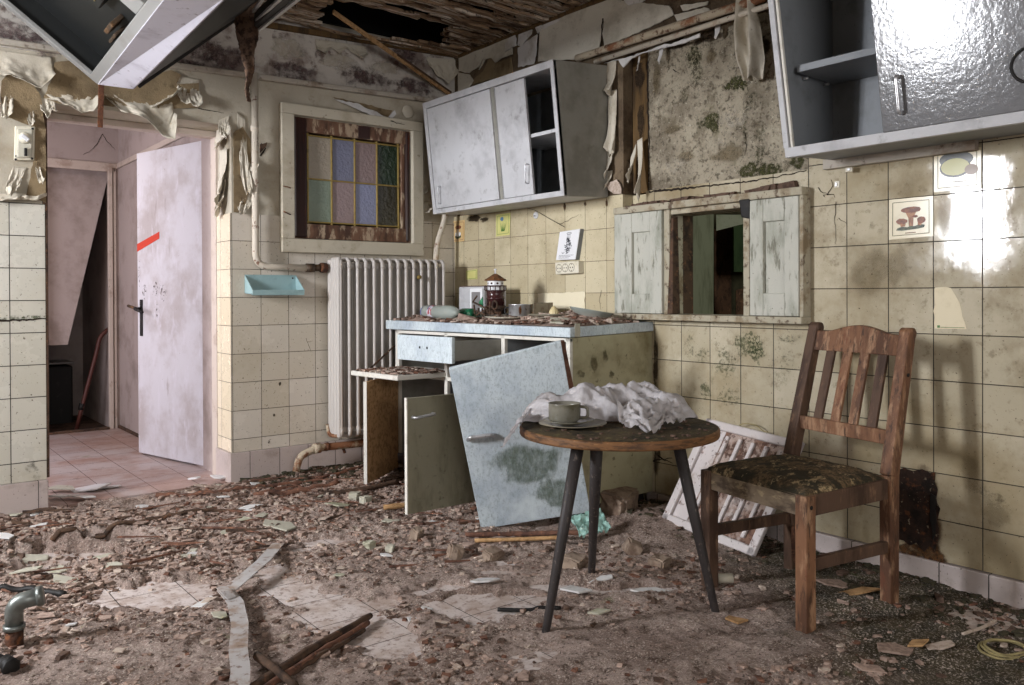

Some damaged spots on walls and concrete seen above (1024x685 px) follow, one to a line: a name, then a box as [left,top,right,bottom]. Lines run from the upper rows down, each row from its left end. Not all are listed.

leakage [177,41,242,69]
leakage [665,28,722,62]
mould [274,62,315,80]
mould [342,67,430,95]
flaking render [0,61,200,203]
leakage [713,147,741,160]
flaking render [606,179,622,194]